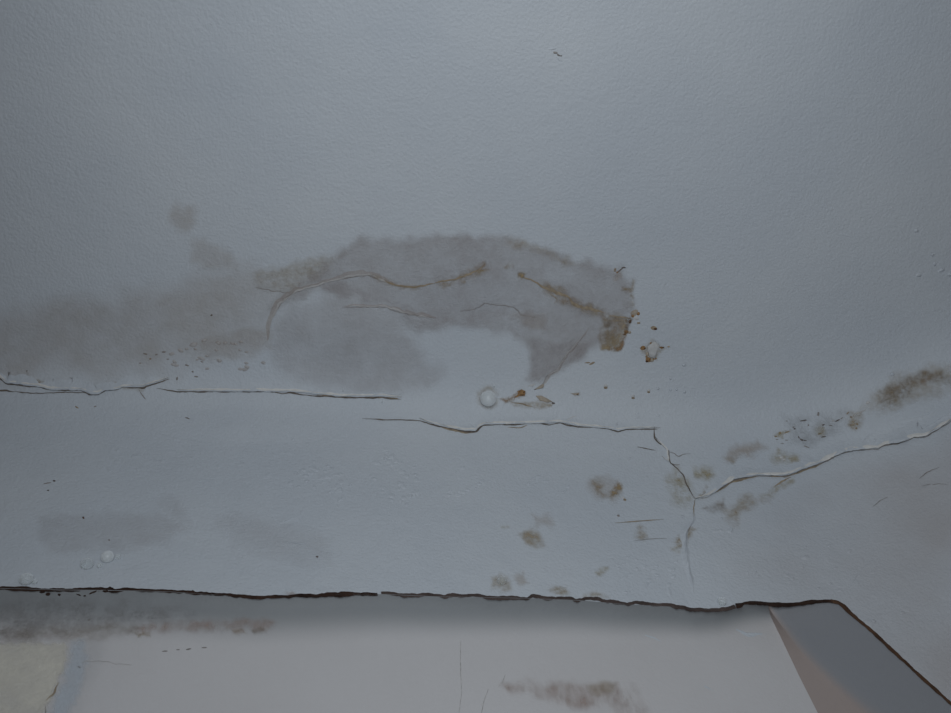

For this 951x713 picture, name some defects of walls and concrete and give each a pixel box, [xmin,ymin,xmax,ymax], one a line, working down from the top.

crack [519,275,631,384]
crack [0,370,951,500]